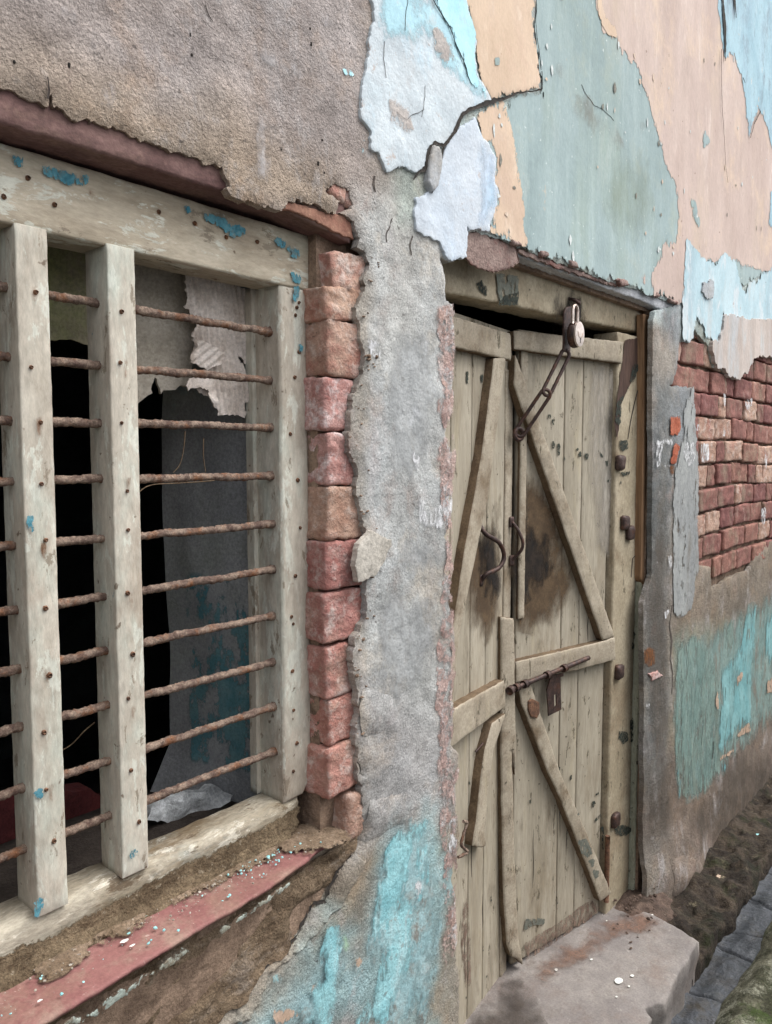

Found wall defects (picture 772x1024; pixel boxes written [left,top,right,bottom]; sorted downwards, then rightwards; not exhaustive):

peeling [282,184,353,240]
crack [413,0,543,193]
peeling [358,0,772,578]
flaking render [50,251,392,1024]
peeling [356,304,483,1024]
peeling [674,600,772,798]